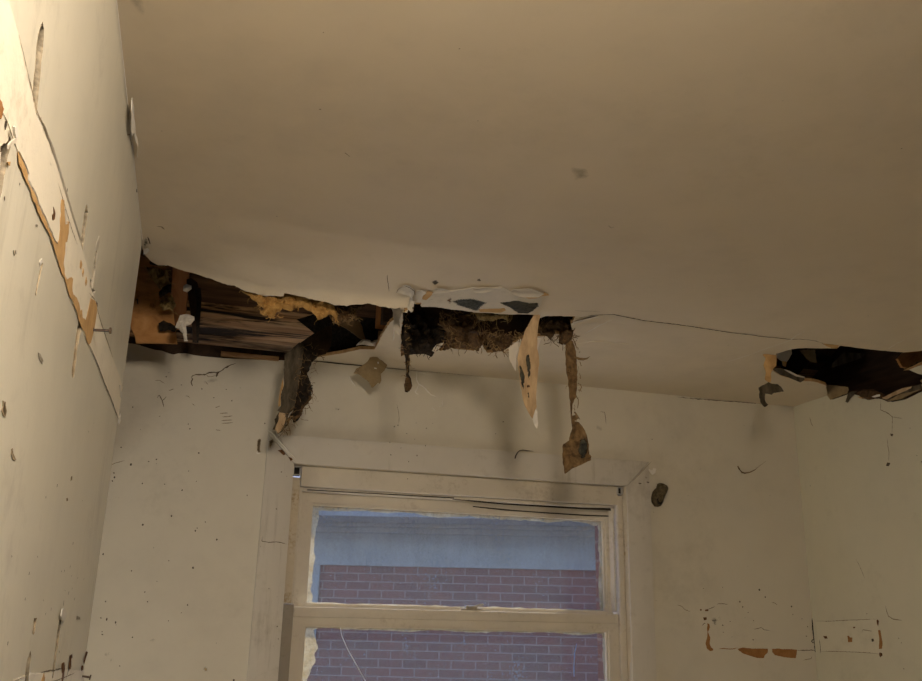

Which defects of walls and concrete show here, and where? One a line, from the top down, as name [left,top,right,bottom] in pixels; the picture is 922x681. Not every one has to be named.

peeling [0,100,99,378]
peeling [391,285,426,340]
spalling [773,368,805,382]
spalling [857,380,922,402]
peeling [256,430,296,461]
spalling [41,608,80,681]
peeling [700,609,815,658]